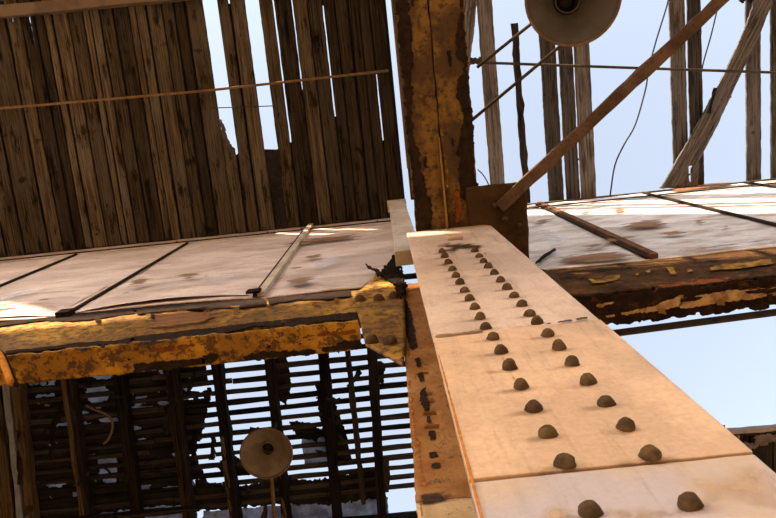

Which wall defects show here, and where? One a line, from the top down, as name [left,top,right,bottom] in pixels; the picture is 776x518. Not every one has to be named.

corrosion [440,243,485,253]
peeling [589,274,621,283]
corrosion [657,277,732,288]
peeling [710,259,774,270]
peeling [596,286,776,318]
corrosion [380,254,436,441]
corrosion [439,356,484,518]
corrosion [414,439,446,516]